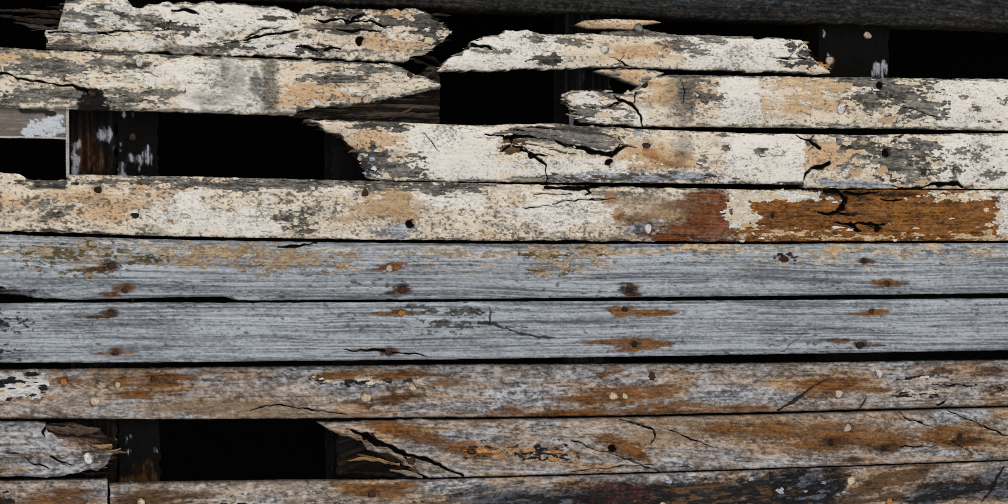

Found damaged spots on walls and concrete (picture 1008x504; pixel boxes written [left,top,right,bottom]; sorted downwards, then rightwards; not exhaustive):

peeling [0,0,231,111]
crack [223,14,389,52]
peeling [202,6,452,85]
crack [485,92,643,209]
peeling [533,36,1008,264]
crack [796,135,963,232]
peeling [0,344,53,402]
rust [87,309,118,318]
rust [99,284,135,297]
rust [583,338,674,352]
rust [606,282,678,317]
crack [250,404,464,477]